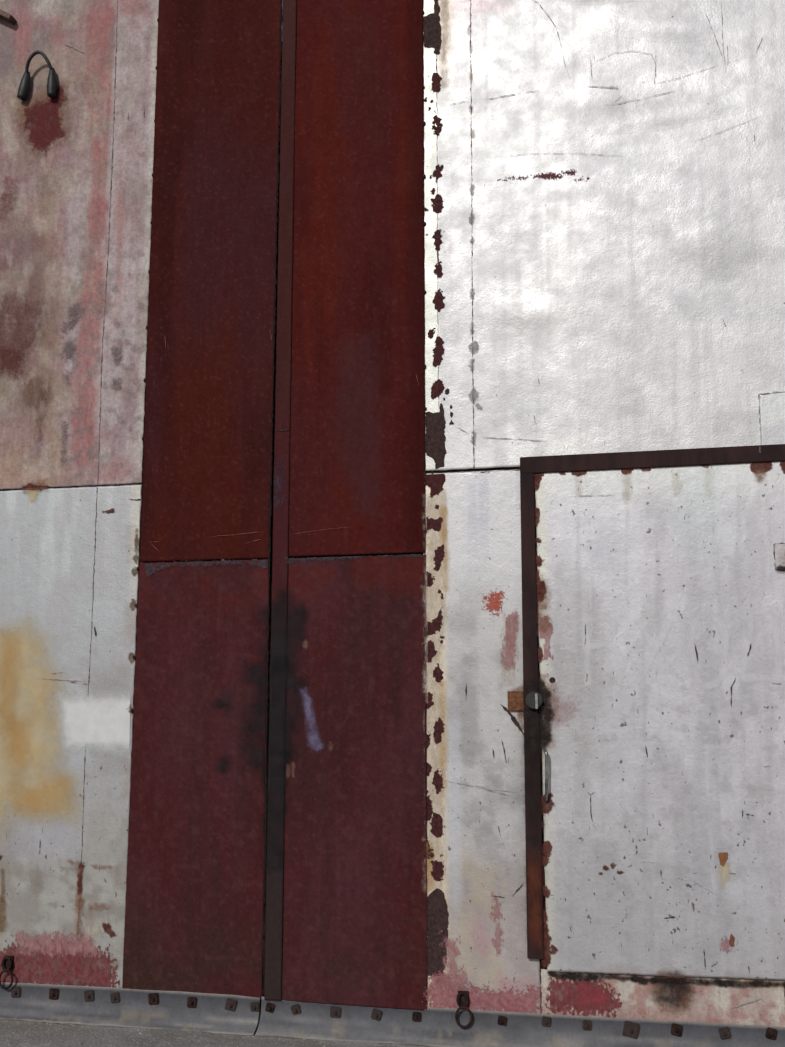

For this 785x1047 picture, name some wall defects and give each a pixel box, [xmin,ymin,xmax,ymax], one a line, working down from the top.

peeling [423,0,443,136]
corrosion [18,86,66,151]
peeling [497,169,591,182]
peeling [377,165,454,748]
corrosion [533,473,544,490]
corrosion [750,461,785,481]
corrosion [535,507,549,631]
peeling [480,590,519,675]
peeling [538,616,553,660]
corrosion [514,677,785,988]
peeling [421,762,627,1018]
peeling [0,930,122,988]